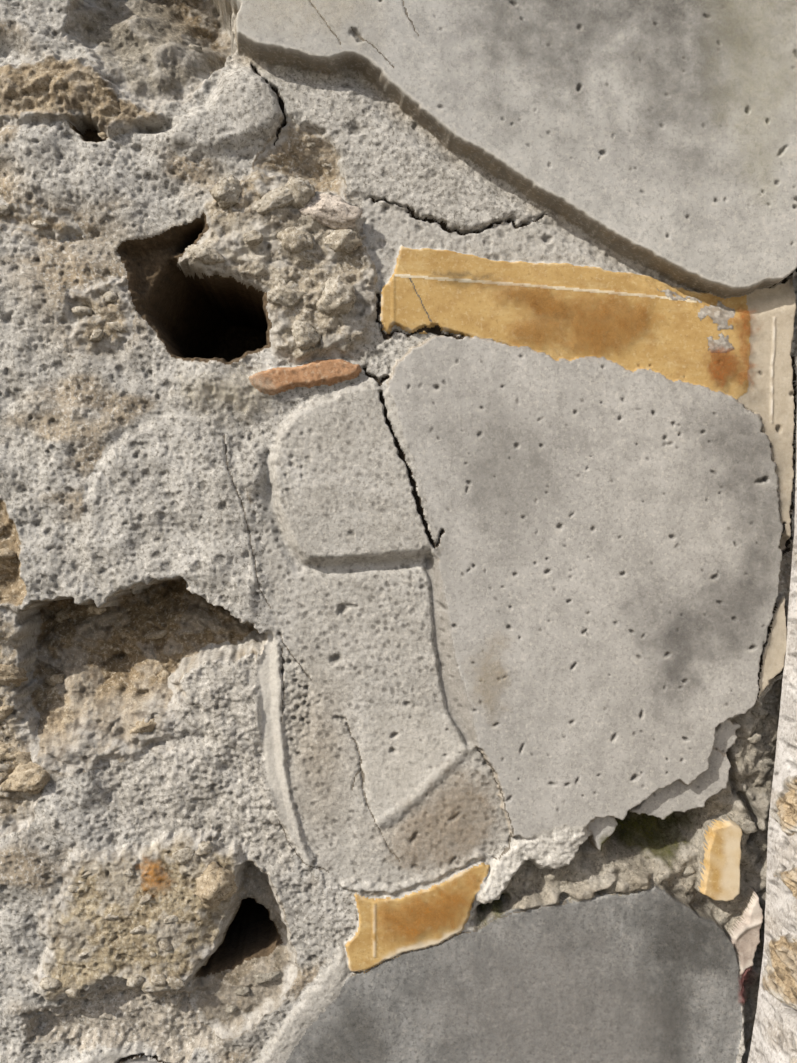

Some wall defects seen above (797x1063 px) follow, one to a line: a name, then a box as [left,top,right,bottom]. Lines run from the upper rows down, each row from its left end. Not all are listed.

crack [252,66,286,146]
crack [371,197,547,236]
crack [363,368,445,549]
spalling [0,500,268,837]
spalling [32,826,299,1040]
crack [345,718,400,862]
spalling [470,676,783,1063]